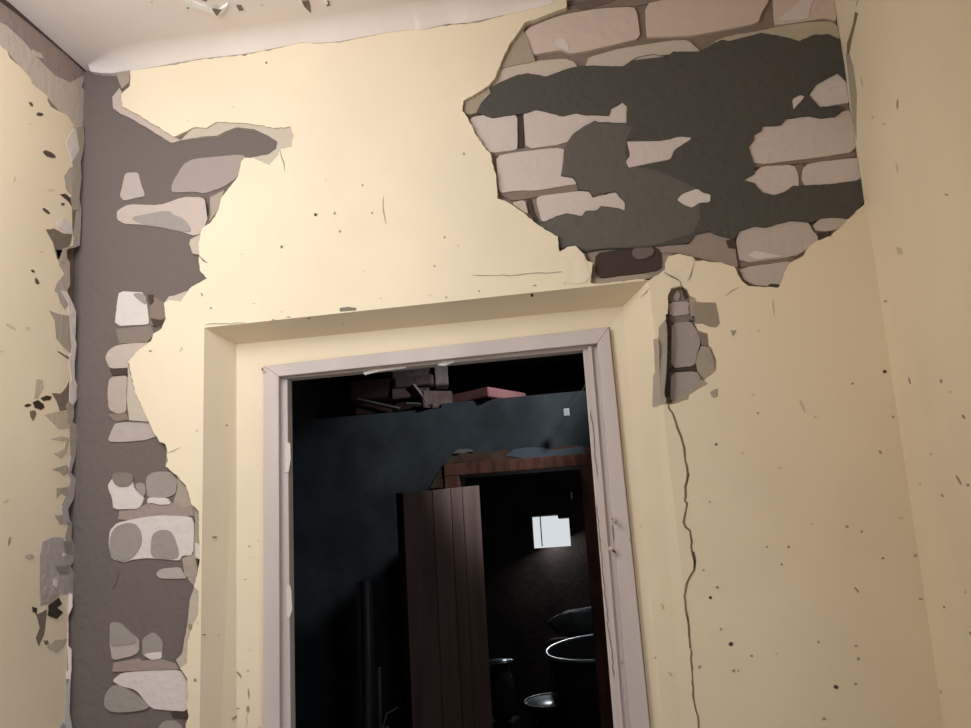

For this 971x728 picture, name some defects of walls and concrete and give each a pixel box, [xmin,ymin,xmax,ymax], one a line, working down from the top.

flaking render [0,0,294,728]
flaking render [464,0,864,288]
crack [664,314,699,728]
flaking render [652,287,720,407]